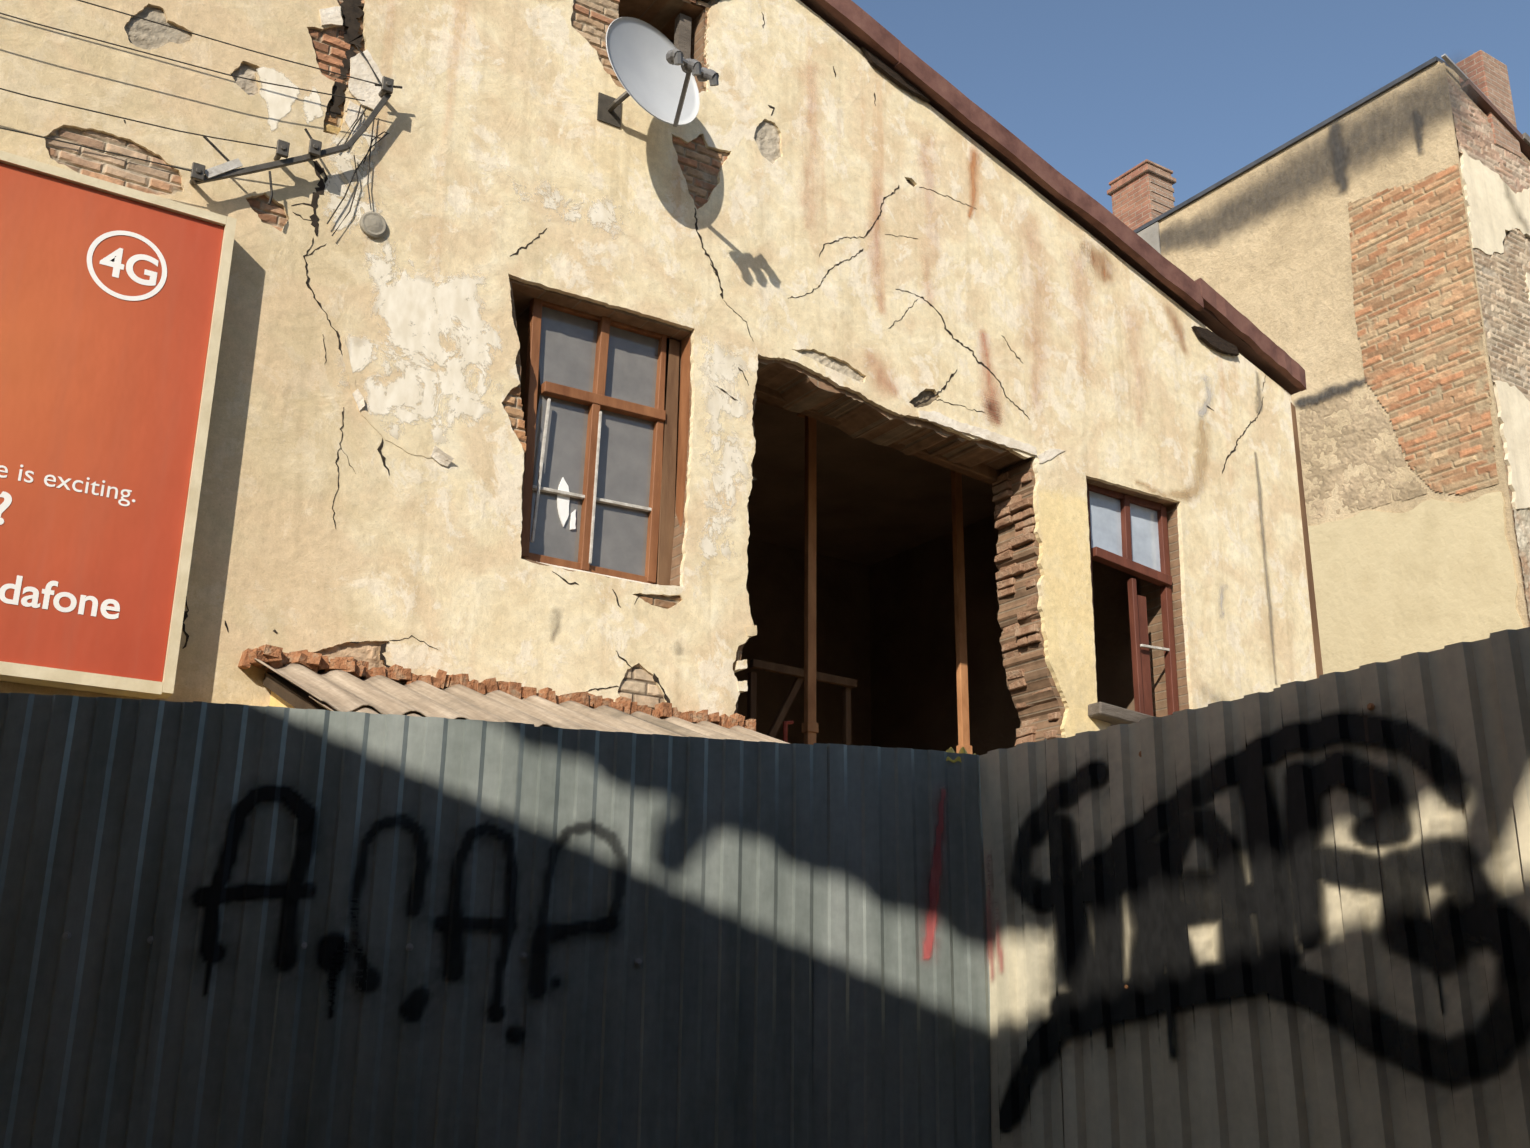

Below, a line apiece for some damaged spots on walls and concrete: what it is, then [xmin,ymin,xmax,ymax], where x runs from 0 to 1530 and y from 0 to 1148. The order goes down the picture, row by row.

spalling [124,6,192,50]
flaking render [571,0,625,89]
flaking render [45,120,183,195]
flaking render [672,136,729,209]
damp [1413,111,1423,152]
crack [291,160,343,363]
crack [694,209,754,401]
crack [790,185,977,298]
crack [890,289,1030,420]
flaking render [1348,96,1530,496]
crack [332,407,390,528]
flaking render [618,664,665,710]